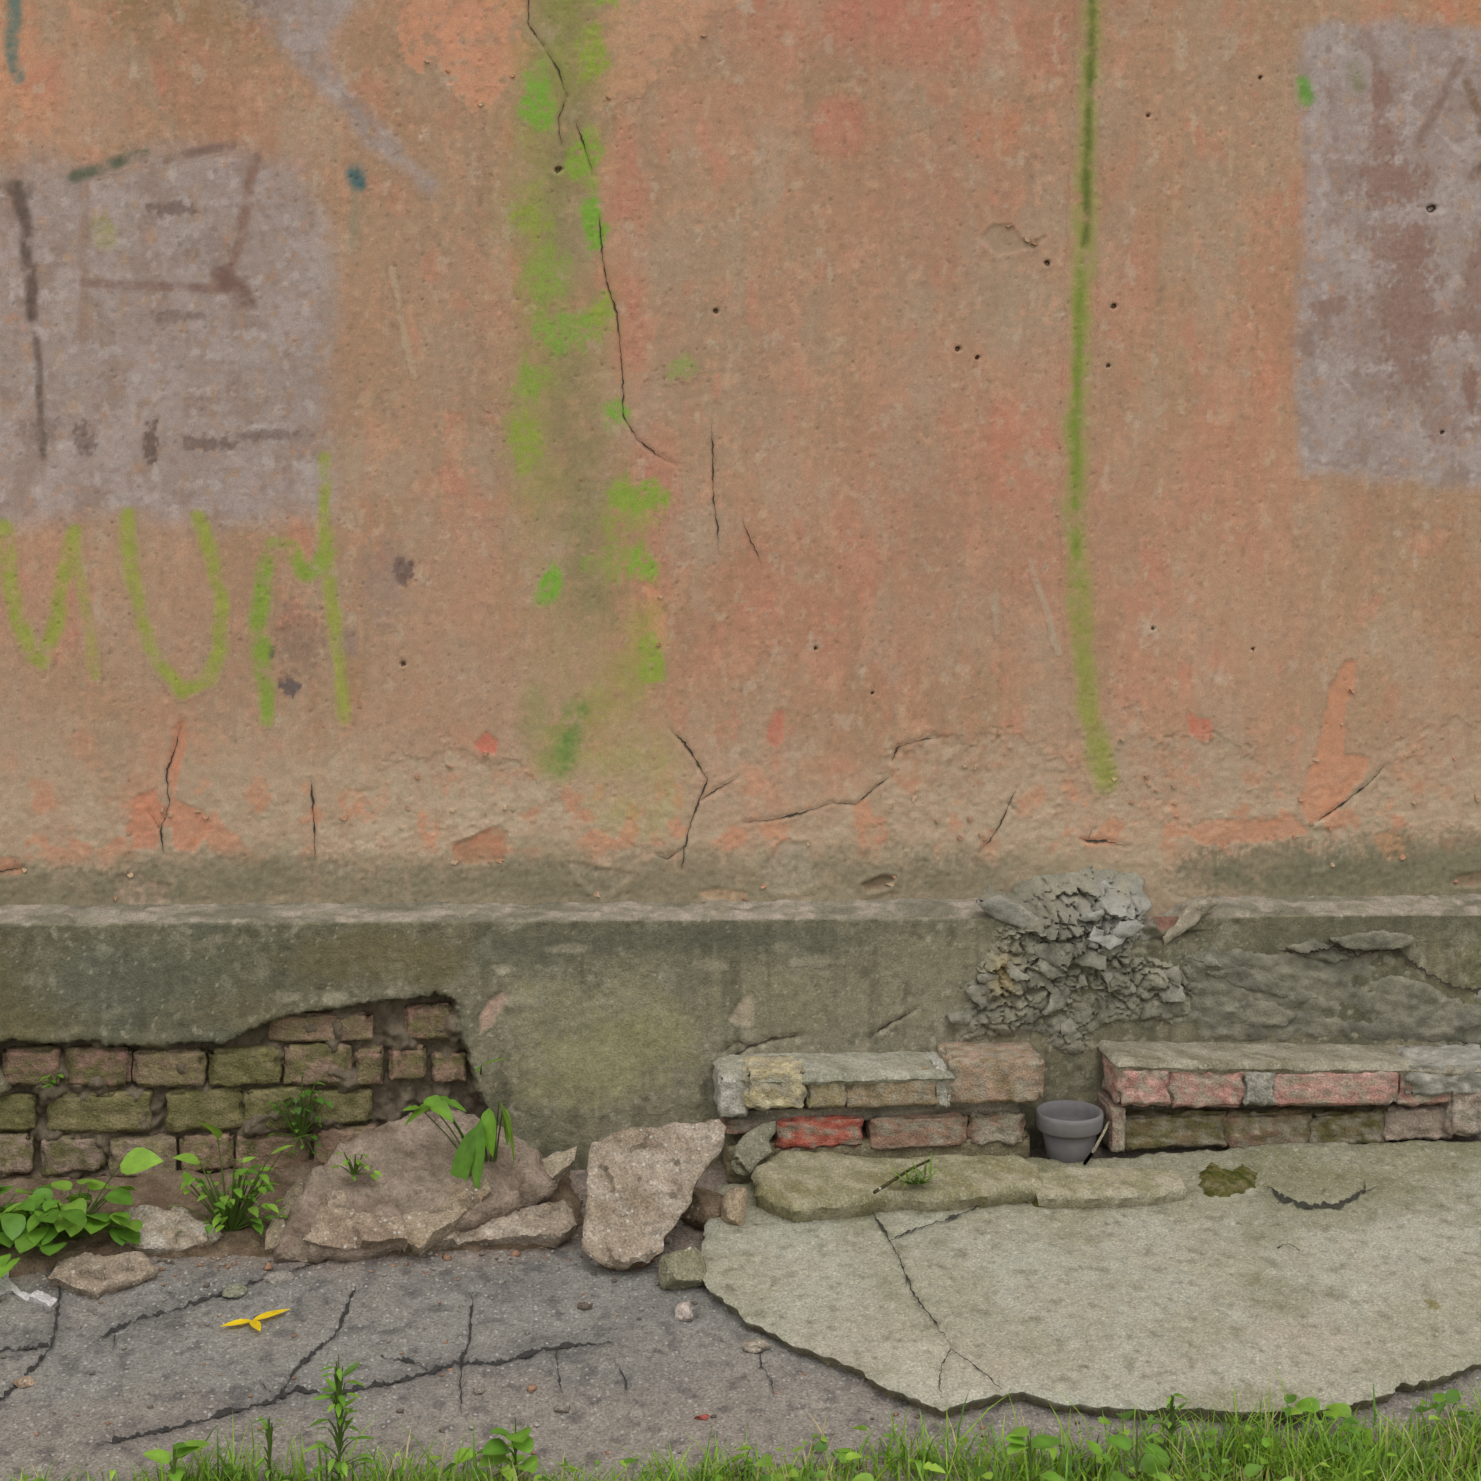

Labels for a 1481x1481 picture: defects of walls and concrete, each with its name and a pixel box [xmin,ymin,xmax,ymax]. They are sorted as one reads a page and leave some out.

crack [528,0,592,168]
crack [599,220,672,462]
crack [657,732,733,866]
crack [749,738,932,822]
crack [979,786,1018,853]
peeling [1298,658,1371,844]
spalling [1151,916,1179,934]
spalling [0,991,502,1183]